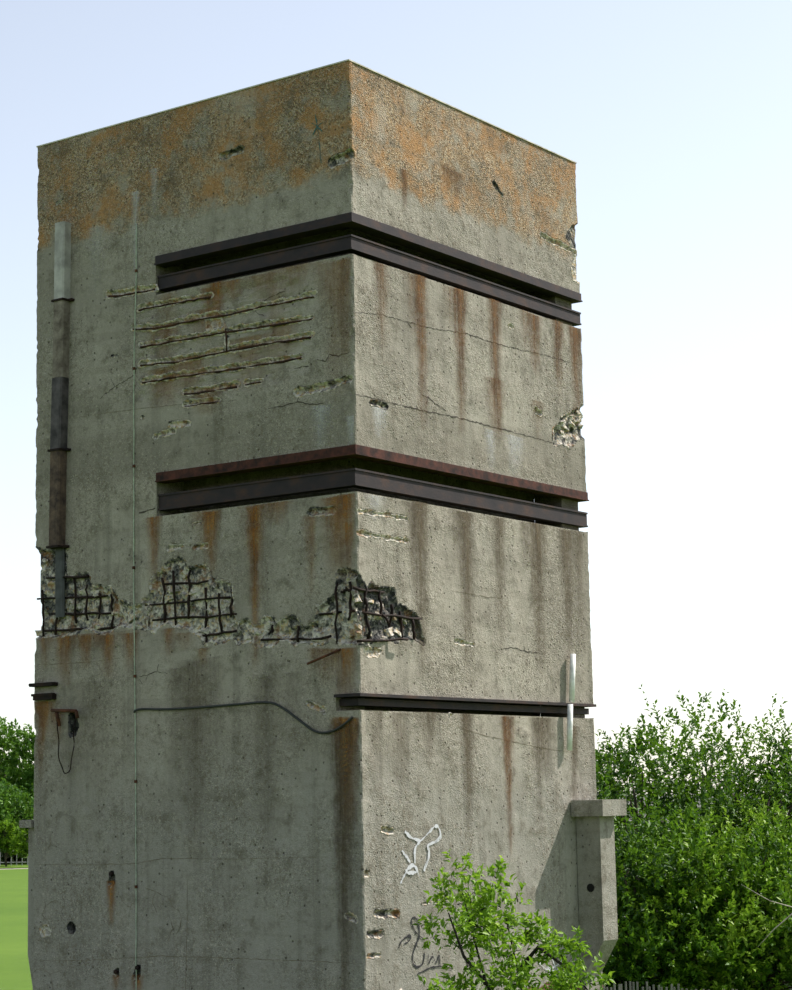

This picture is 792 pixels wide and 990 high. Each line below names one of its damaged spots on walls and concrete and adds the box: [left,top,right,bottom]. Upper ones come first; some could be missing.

spalling [142,357,302,384]
spalling [132,296,314,366]
spalling [184,382,262,407]
spalling [293,374,354,398]
corrosion [416,275,425,368]
corrosion [454,288,464,387]
corrosion [491,299,499,395]
corrosion [555,320,581,388]
spalling [552,405,585,450]
spalling [35,542,425,665]